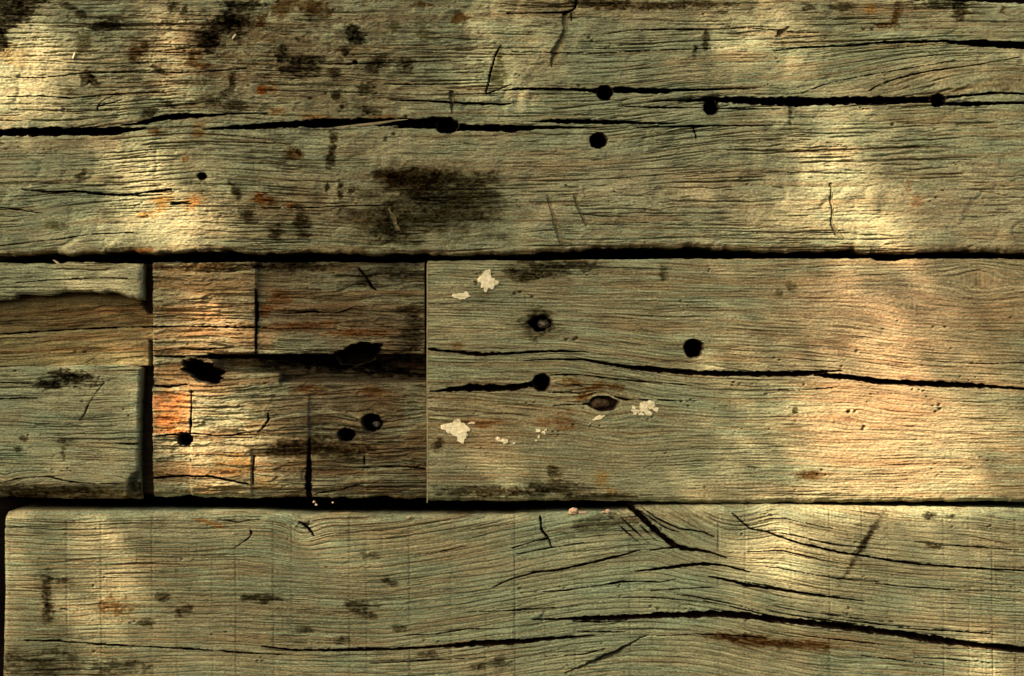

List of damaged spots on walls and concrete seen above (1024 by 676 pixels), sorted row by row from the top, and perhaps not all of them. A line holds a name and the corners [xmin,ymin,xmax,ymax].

crack [0,28,1024,137]
damp [347,166,500,244]
crack [0,308,352,362]
crack [370,348,1024,406]
peeling [445,422,475,444]
peeling [631,400,659,416]
crack [25,504,1024,665]